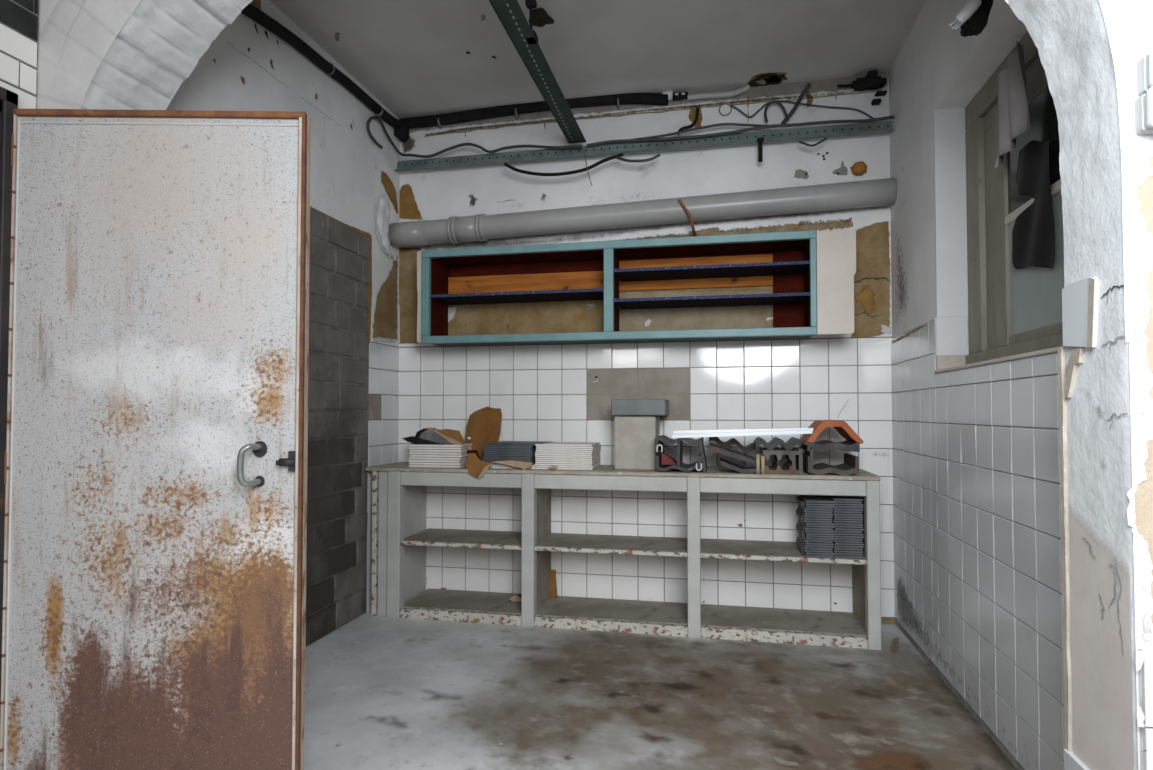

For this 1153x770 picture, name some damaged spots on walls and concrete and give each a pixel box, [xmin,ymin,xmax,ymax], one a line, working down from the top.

flaking render [323,214,421,345]
flaking render [448,300,604,336]
flaking render [610,217,892,343]
peeling [587,368,690,420]
spalling [1127,152,1153,671]